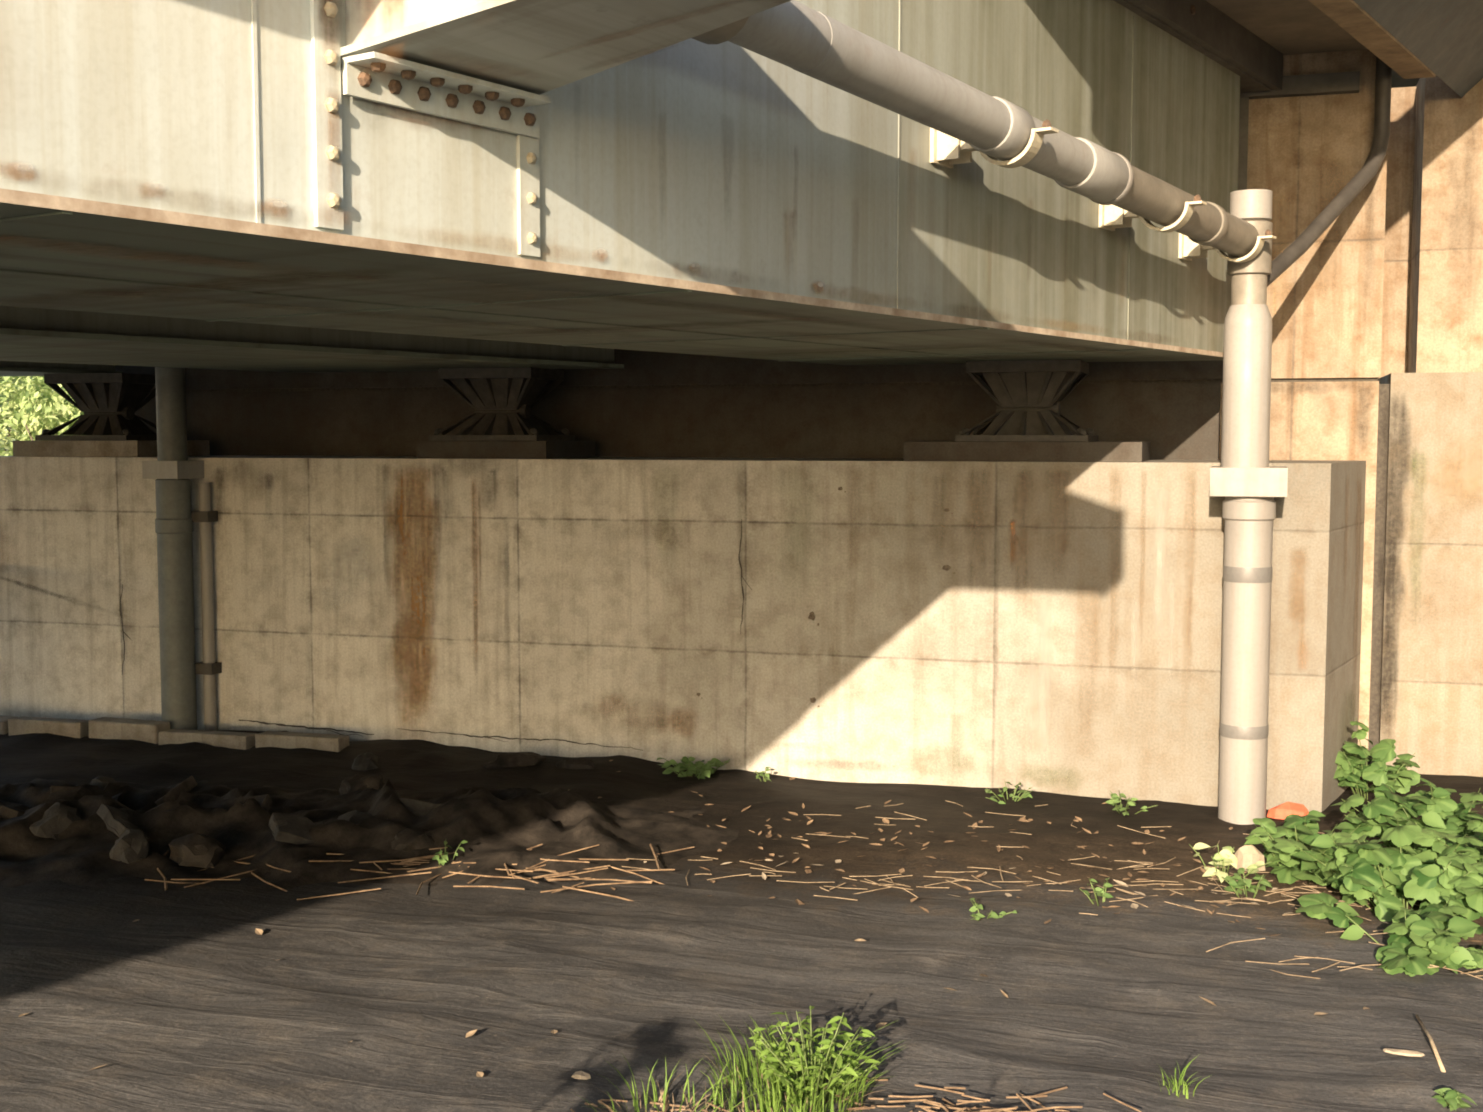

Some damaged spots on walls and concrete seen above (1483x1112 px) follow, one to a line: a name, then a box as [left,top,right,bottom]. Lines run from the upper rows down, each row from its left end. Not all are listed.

rust [396,473,427,688]
water stain [1385,468,1403,596]